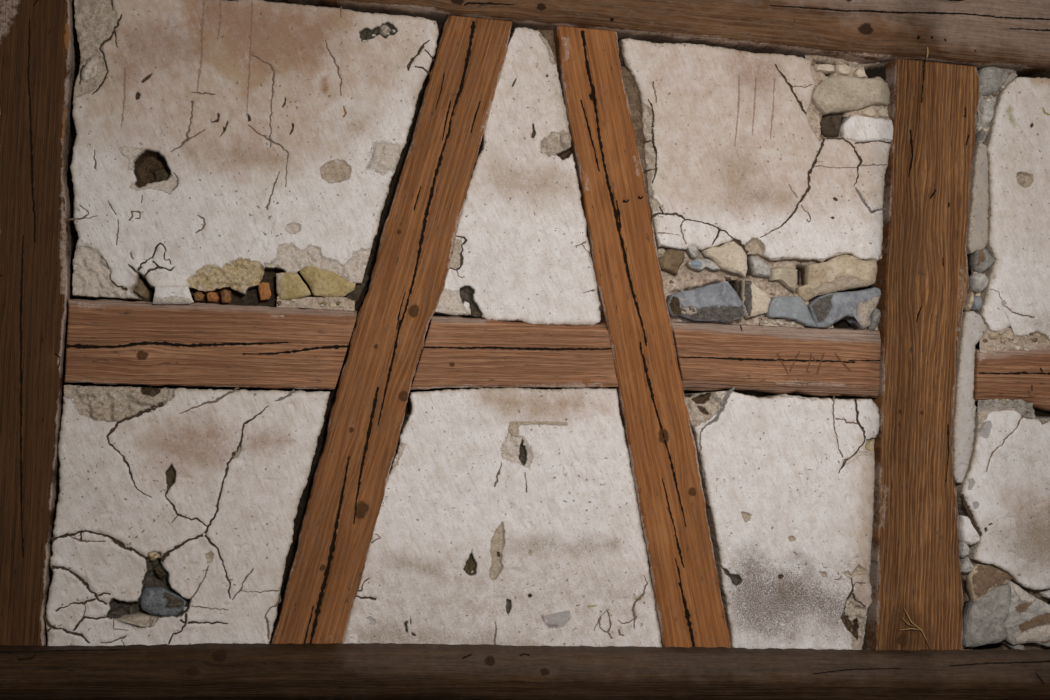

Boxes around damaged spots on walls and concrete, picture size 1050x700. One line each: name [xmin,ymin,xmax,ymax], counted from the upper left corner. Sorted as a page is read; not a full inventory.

spalling [120,146,146,170]
spalling [130,175,177,193]
crack [248,55,289,210]
crack [69,195,175,291]
spalling [154,223,371,303]
spalling [745,238,878,262]
crack [66,341,349,355]
crack [304,2,514,644]
crack [423,344,612,352]
crack [580,30,913,647]
crack [0,387,295,660]
spalling [841,595,866,650]